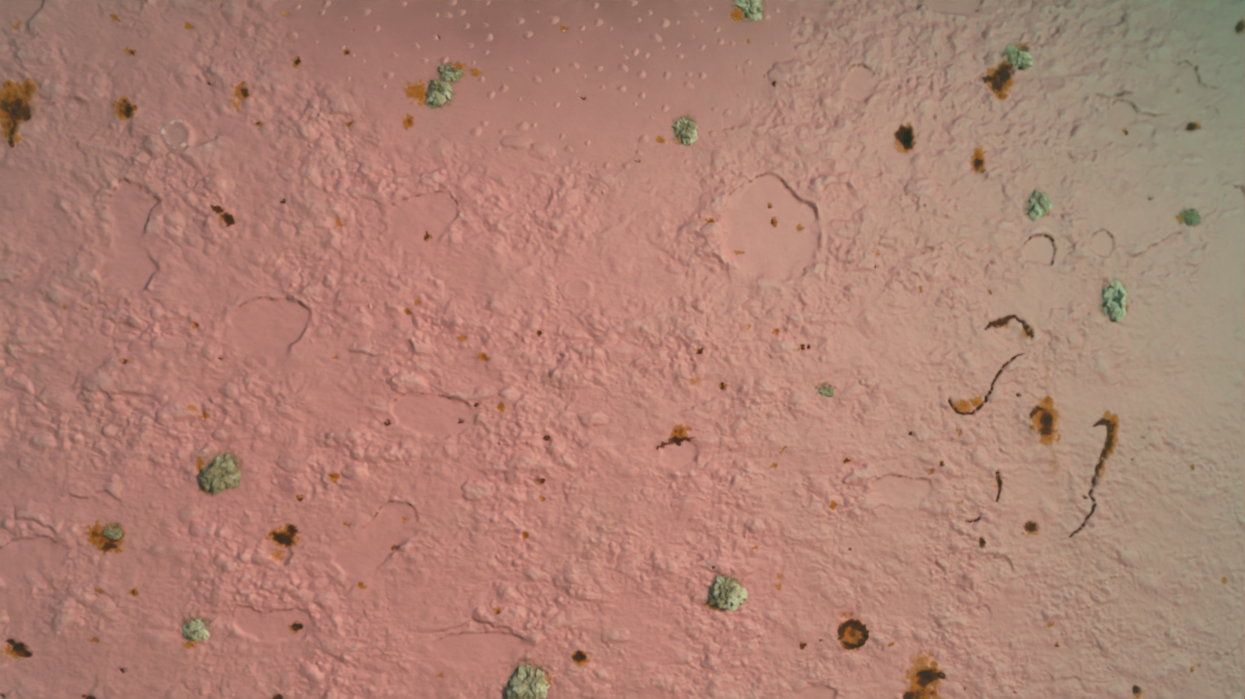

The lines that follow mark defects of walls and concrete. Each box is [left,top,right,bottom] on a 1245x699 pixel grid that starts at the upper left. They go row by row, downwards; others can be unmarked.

rust [0,79,36,147]
rust [983,62,1014,100]
spalling [684,172,821,281]
crack [1124,177,1245,257]
crack [948,315,1034,415]
crack [1069,411,1119,538]
rust [903,653,945,699]